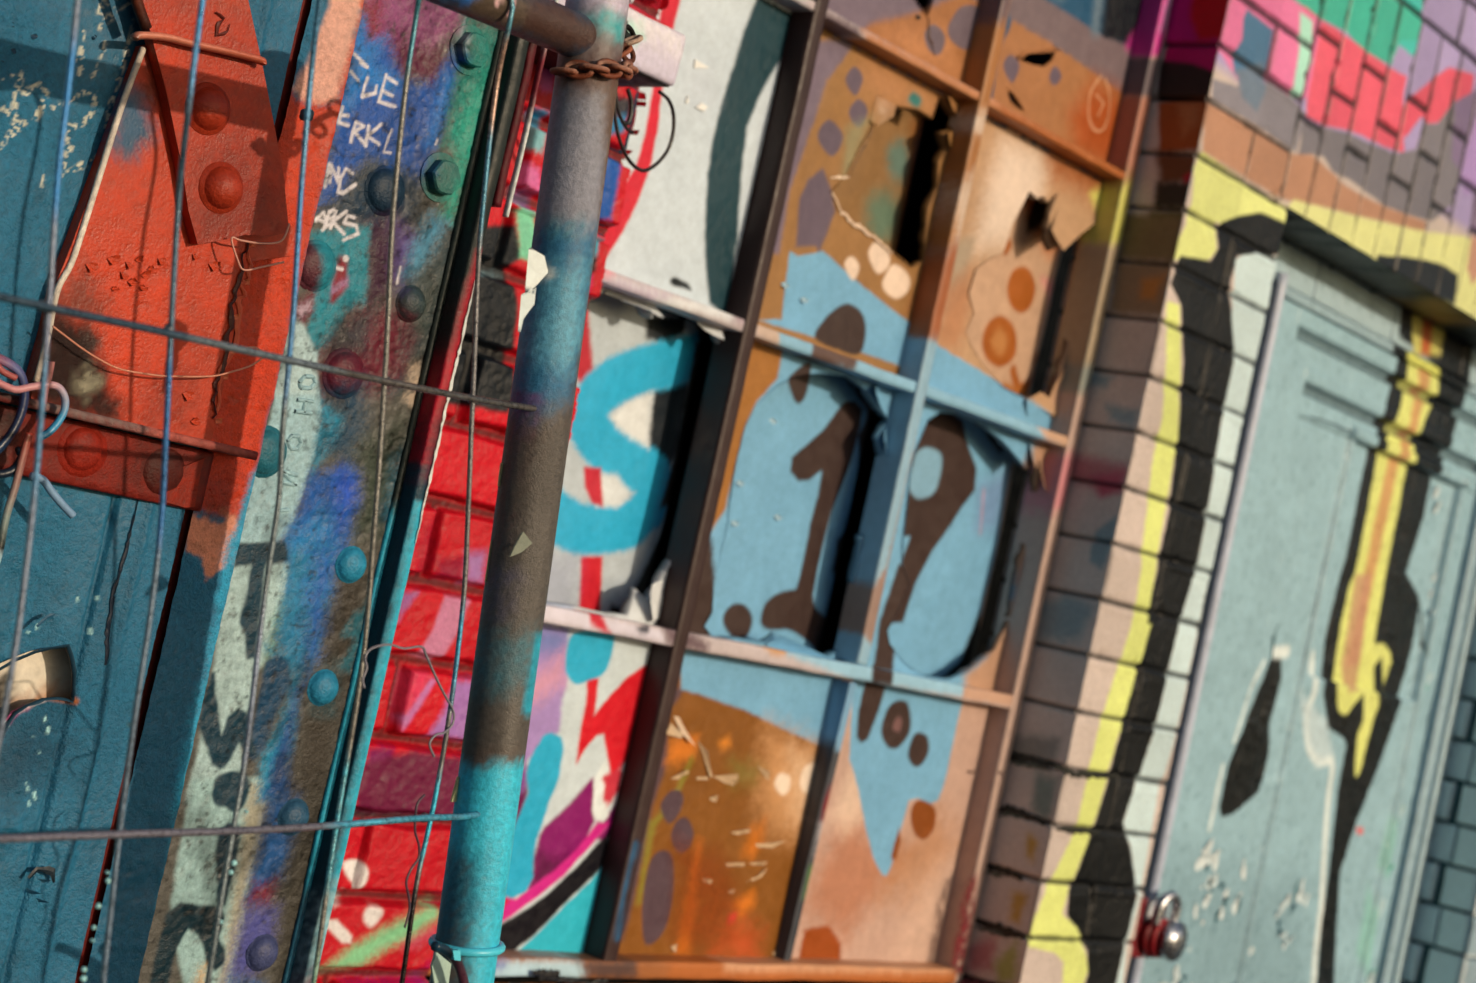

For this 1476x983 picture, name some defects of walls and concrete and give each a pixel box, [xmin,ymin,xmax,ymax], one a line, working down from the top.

spalling [26,866,55,903]